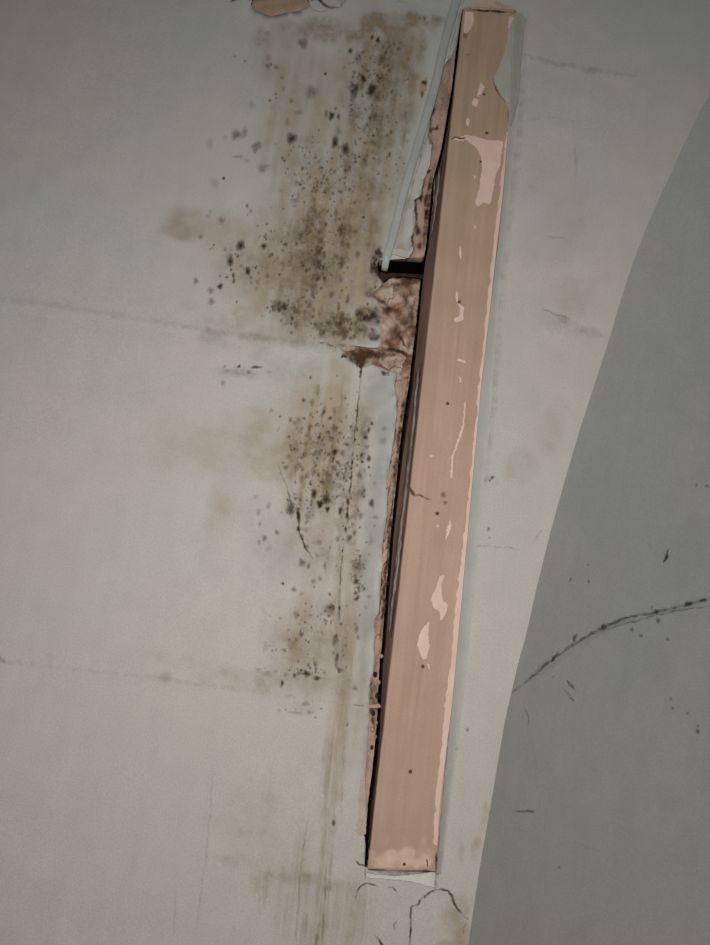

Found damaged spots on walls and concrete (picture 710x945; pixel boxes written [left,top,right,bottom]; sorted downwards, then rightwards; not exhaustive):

peeling [252,0,327,16]
damp [262,13,417,338]
damp [289,386,357,533]
spalling [335,49,508,845]
crack [358,863,460,936]